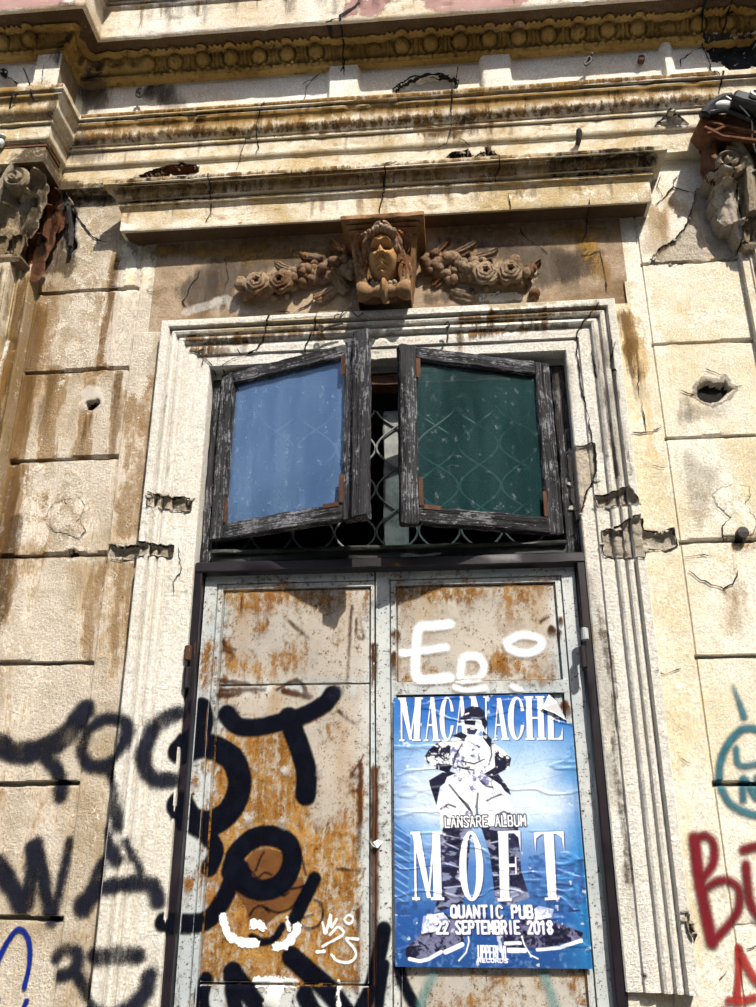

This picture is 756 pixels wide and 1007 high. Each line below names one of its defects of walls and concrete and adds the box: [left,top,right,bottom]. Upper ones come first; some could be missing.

crack [303,0,360,98]
peeling [343,0,390,18]
peeling [422,0,527,12]
leakage [0,84,63,125]
leakage [69,71,718,159]
crack [655,174,690,205]
crack [576,198,665,488]
leakage [617,310,641,376]
spalling [566,442,678,559]
rust [201,638,312,699]
rust [221,581,378,685]
rust [183,731,379,1007]